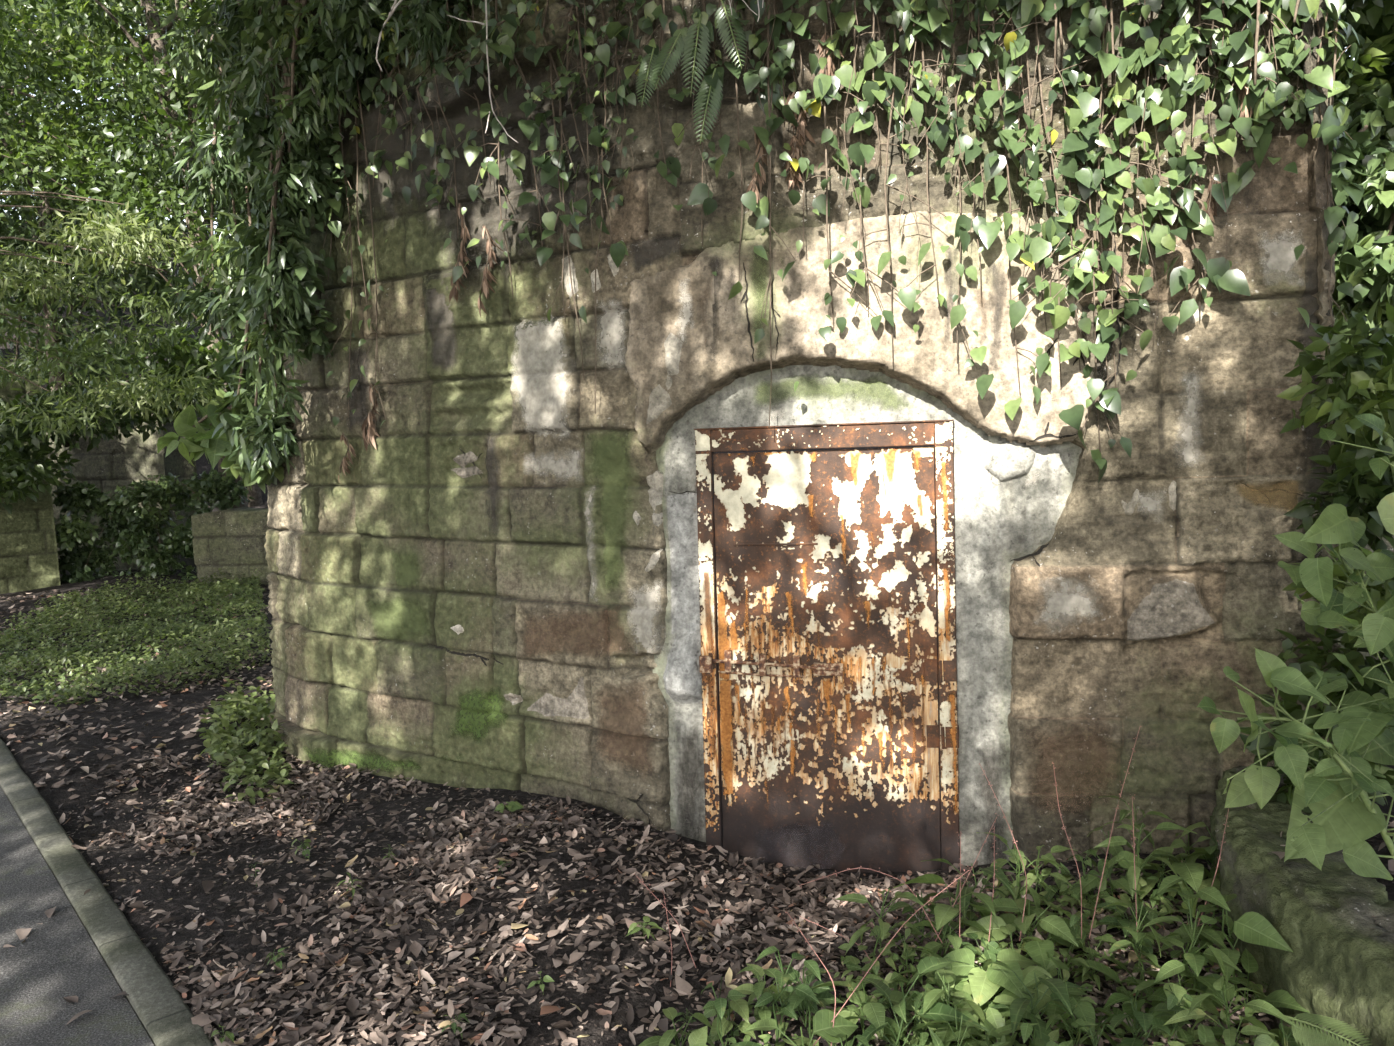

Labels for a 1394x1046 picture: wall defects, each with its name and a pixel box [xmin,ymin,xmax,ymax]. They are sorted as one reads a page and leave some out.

leakage [514,320,568,435]
leakage [600,302,628,366]
leakage [525,435,628,588]
corrosion [851,452,860,485]
corrosion [882,449,895,494]
peeling [633,421,959,832]
corrosion [704,562,925,795]
corrosion [943,569,951,642]
corrosion [948,693,958,813]